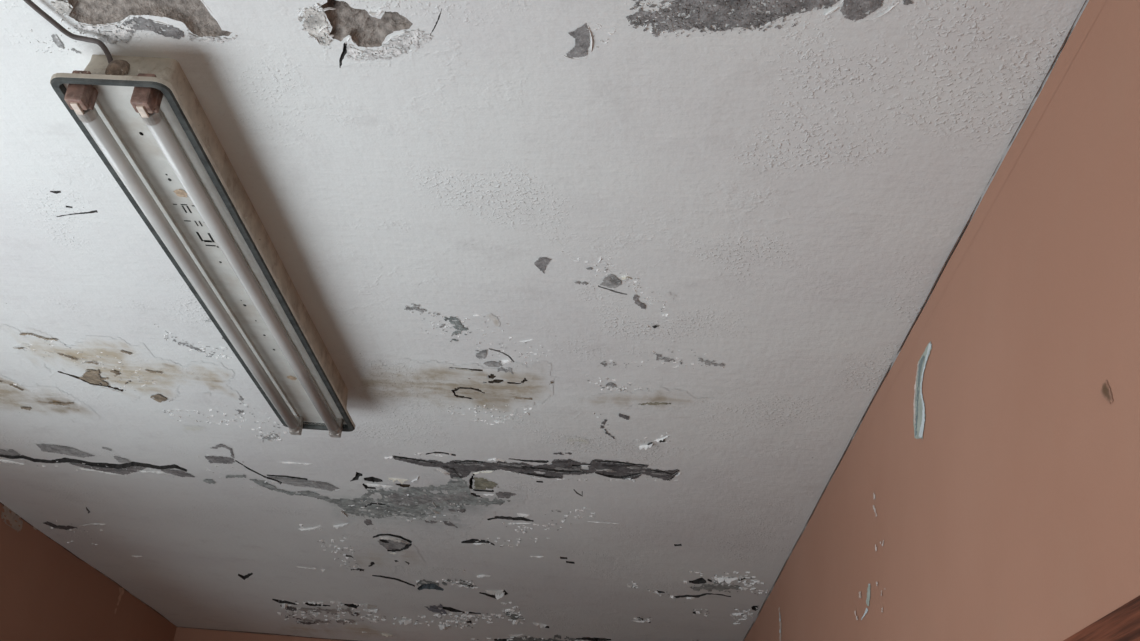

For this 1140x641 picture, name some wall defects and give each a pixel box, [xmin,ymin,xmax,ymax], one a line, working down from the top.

spalling [29,0,237,54]
spalling [297,0,442,68]
peeling [563,24,615,60]
peeling [626,0,913,37]
damp [0,324,242,402]
damp [0,374,100,422]
damp [351,358,556,425]
peeling [913,342,932,439]
peeling [203,444,527,539]
peeling [272,598,434,641]
peeling [479,590,549,628]
peeling [683,571,768,624]